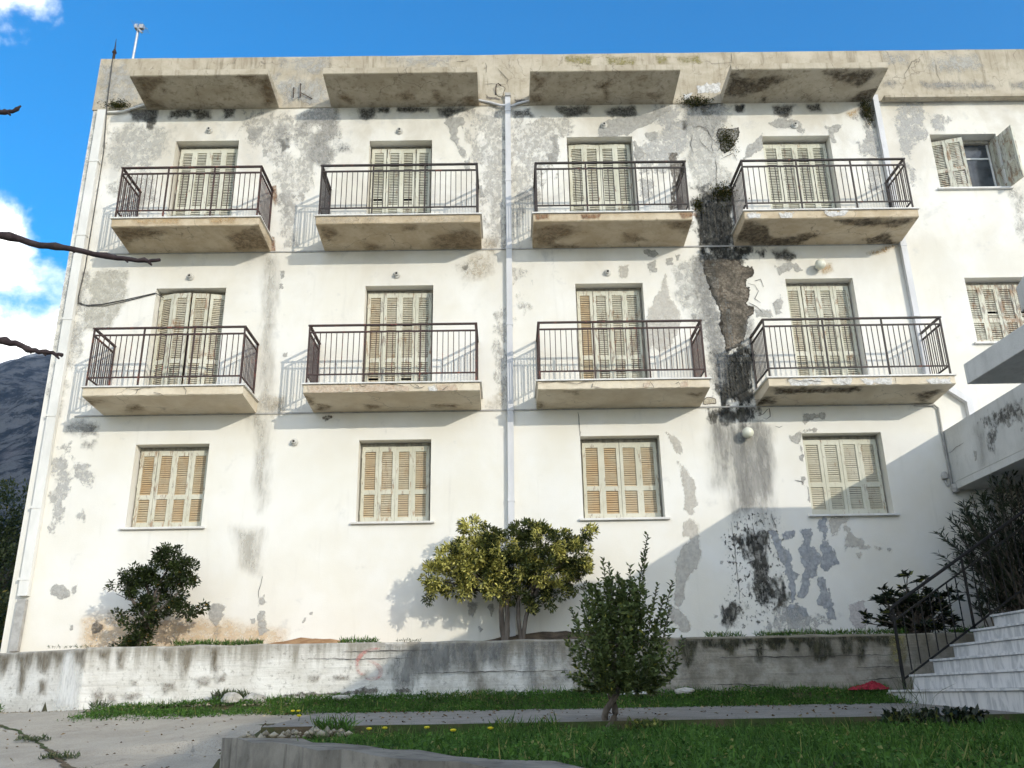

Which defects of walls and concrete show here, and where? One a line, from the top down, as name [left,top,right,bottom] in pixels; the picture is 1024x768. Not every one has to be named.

damp [606,106,637,118]
damp [240,57,590,249]
peeling [444,117,470,169]
peeling [598,83,721,210]
spalling [716,127,763,159]
damp [835,219,912,244]
damp [674,70,895,667]
peeling [666,432,701,632]
peeling [768,517,891,622]
peeling [849,600,868,628]
damp [0,652,84,707]
damp [198,648,225,684]